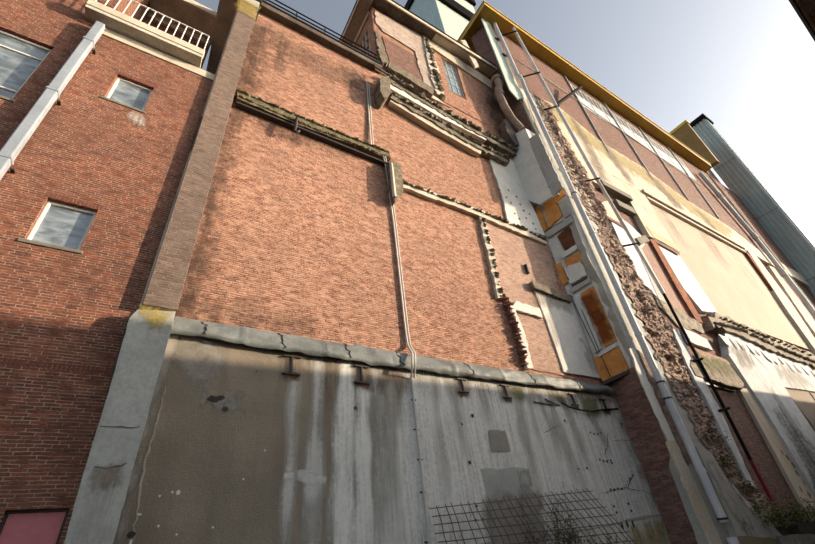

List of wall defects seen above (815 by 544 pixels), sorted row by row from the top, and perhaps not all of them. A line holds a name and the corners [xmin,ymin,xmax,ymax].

crack [94,386,166,541]
damp [282,358,403,544]
crack [600,474,651,494]
damp [775,410,815,487]